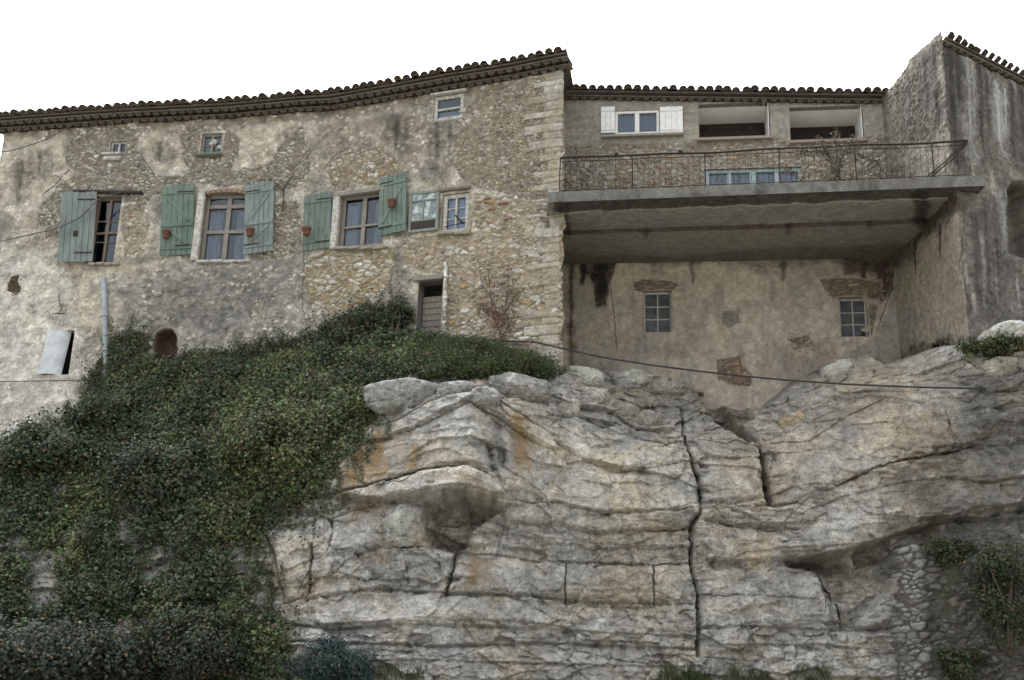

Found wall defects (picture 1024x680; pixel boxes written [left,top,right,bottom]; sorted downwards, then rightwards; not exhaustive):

leakage [995,82,1006,139]
flaking render [33,71,566,368]
leakage [554,186,984,299]
spalling [7,273,21,296]
leakage [568,263,616,335]
spalling [630,273,679,291]
spalling [820,274,887,336]
spalling [787,332,815,351]
spalling [717,356,752,387]